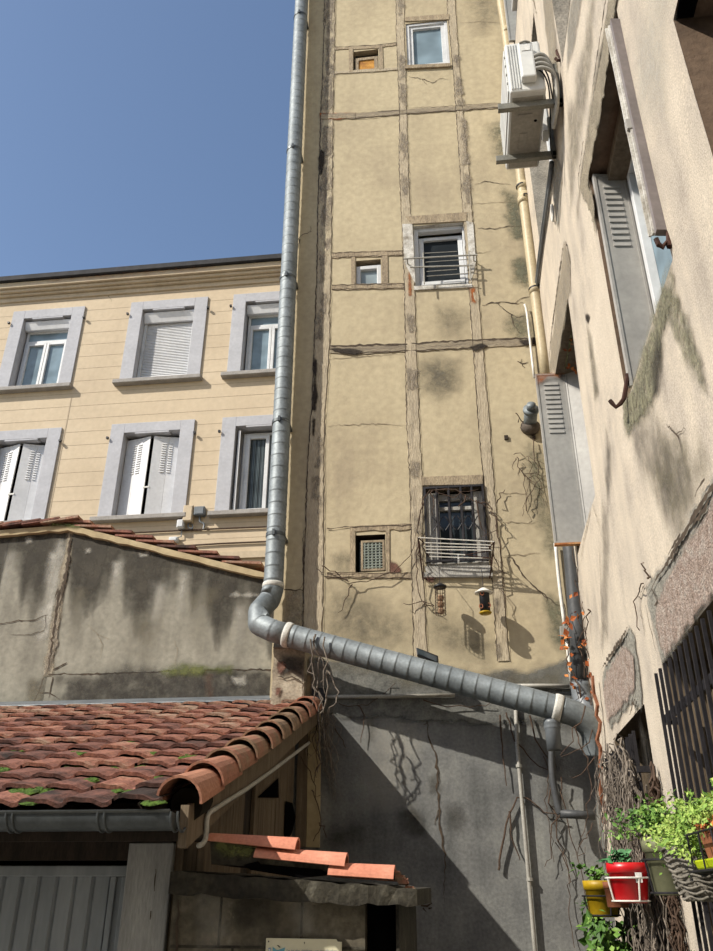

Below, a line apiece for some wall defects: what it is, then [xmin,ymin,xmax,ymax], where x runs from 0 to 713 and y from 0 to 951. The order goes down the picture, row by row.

peeling [318,126,333,226]
leakage [623,274,703,434]
leakage [0,533,264,638]
spalling [646,478,713,663]
spalling [602,627,642,729]
crack [421,721,446,912]